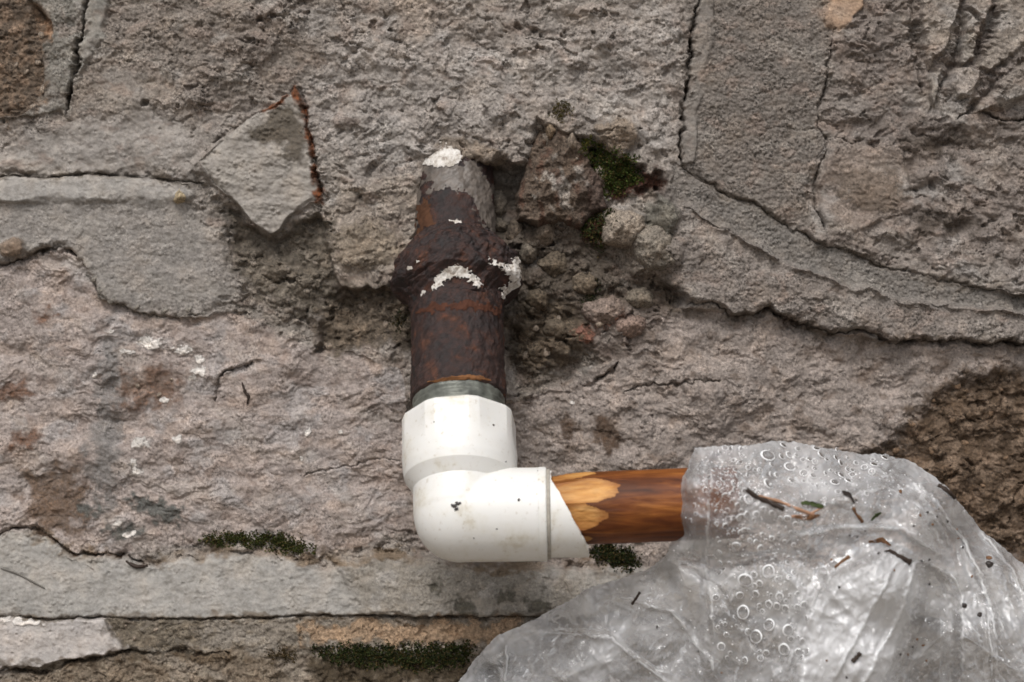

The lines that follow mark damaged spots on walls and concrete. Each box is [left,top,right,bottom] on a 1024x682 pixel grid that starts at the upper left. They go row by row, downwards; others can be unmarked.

crack [66,0,89,112]
crack [678,5,726,195]
spalling [511,300,590,383]
crack [713,302,1018,346]